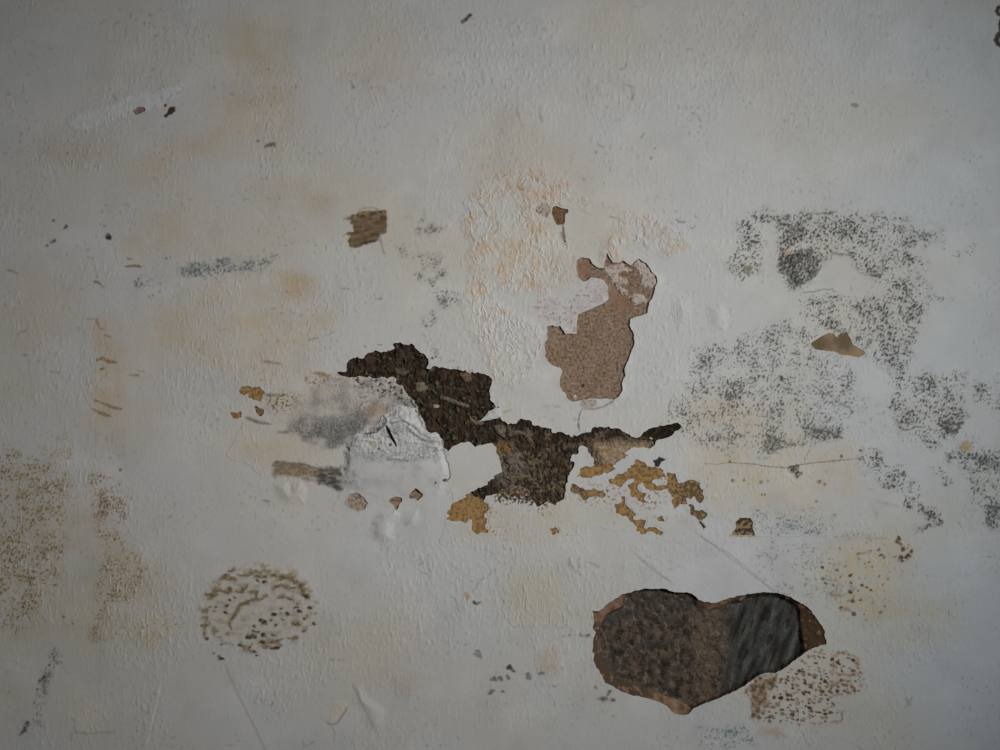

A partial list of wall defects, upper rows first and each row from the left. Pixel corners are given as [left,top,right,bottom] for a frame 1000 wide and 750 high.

damp [29,0,421,490]
damp [418,257,458,306]
peeling [433,396,534,450]
peeling [457,161,695,429]
peeling [811,332,865,357]
damp [730,211,1000,528]
damp [0,454,175,674]
peeling [447,493,489,534]
peeling [570,459,707,536]
damp [440,325,982,657]
flaking render [592,588,827,715]
damp [770,670,914,750]